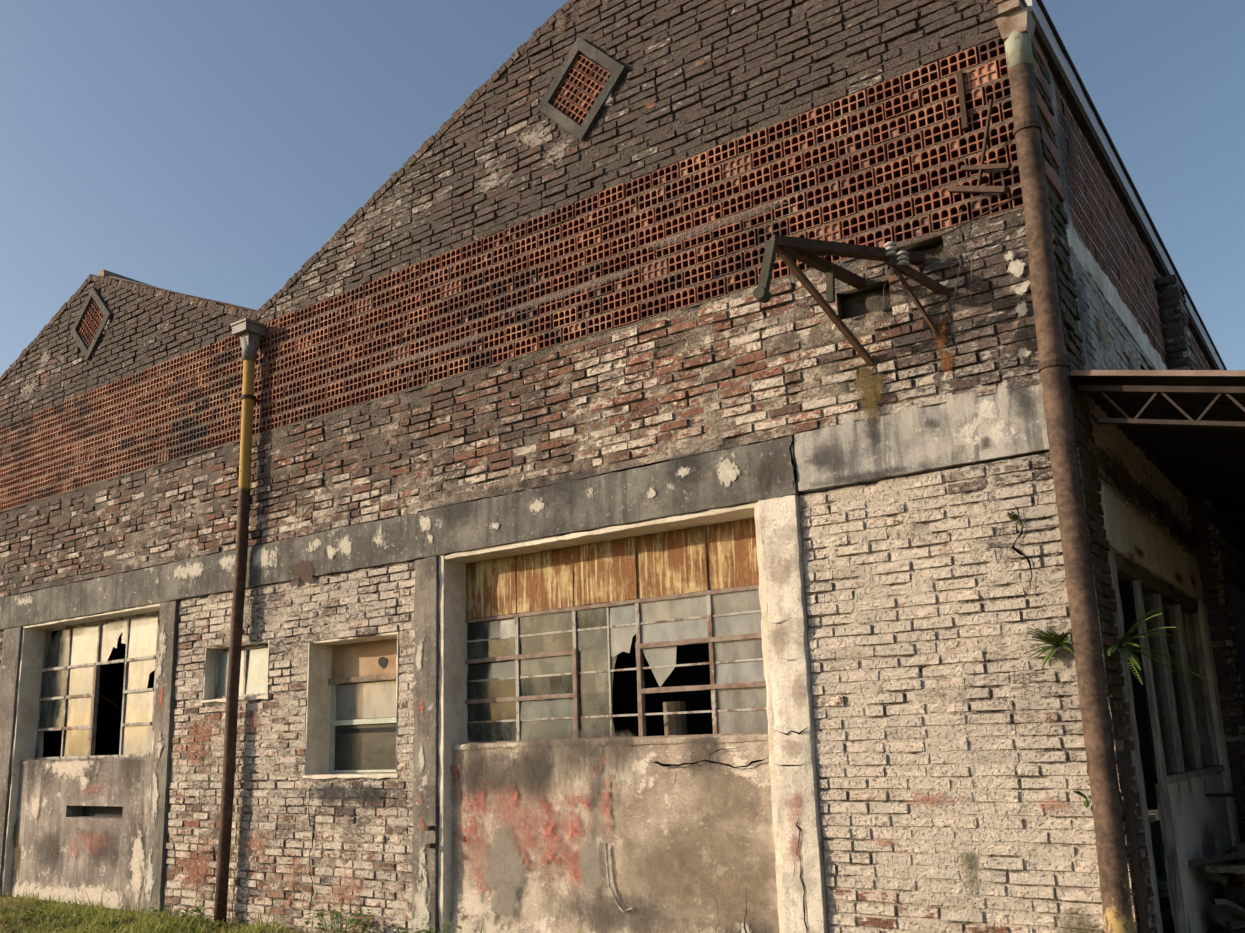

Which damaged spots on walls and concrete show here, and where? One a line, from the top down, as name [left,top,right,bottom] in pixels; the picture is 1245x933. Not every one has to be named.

damp [897,393,975,461]
damp [997,386,1028,419]
damp [810,447,902,485]
damp [27,758,100,819]
damp [462,731,632,804]
crack [645,727,810,790]
damp [11,814,145,910]
flaking render [450,753,633,917]
crack [793,813,808,933]
damp [450,892,528,933]
damp [567,894,670,933]
crack [713,892,747,933]